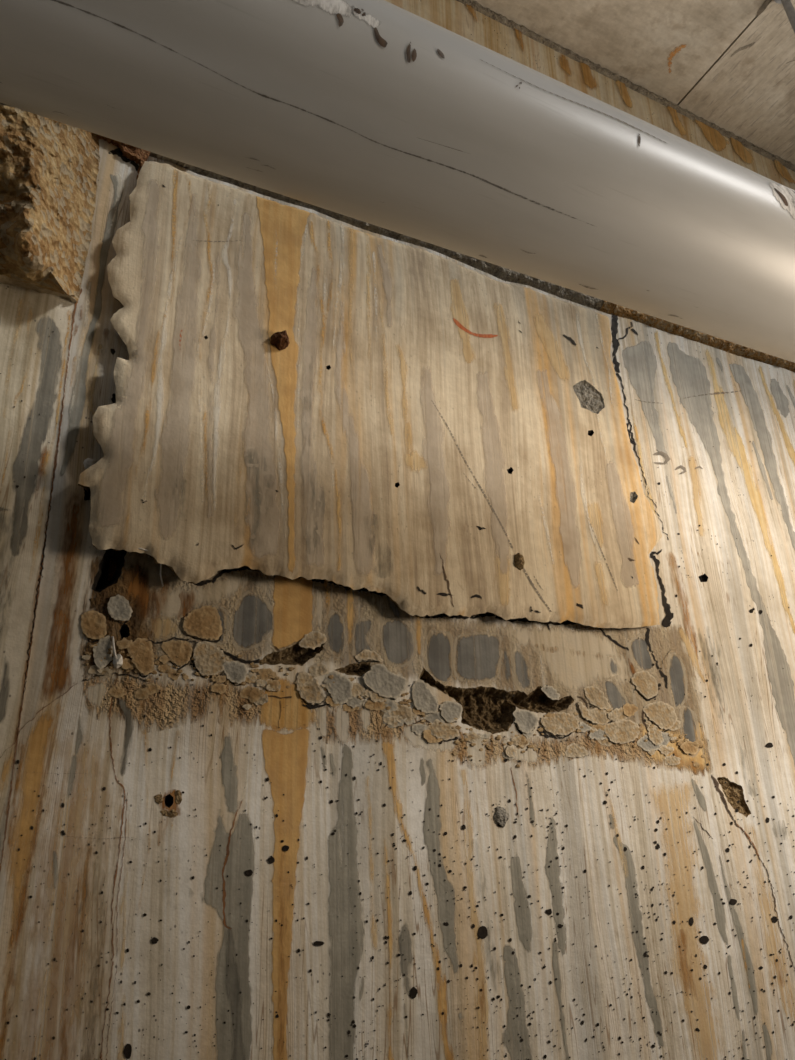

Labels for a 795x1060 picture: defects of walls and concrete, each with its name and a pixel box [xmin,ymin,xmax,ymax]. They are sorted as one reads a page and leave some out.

spalling [0,103,100,303]
rust [96,134,150,179]
spalling [149,152,795,372]
rust [256,196,353,650]
peeling [81,550,751,818]
crack [411,401,576,630]
crack [600,315,674,688]
leakage [622,341,795,763]
leakage [204,737,255,1060]
rust [262,728,309,1060]
leakage [321,745,365,1060]
crack [711,775,795,971]